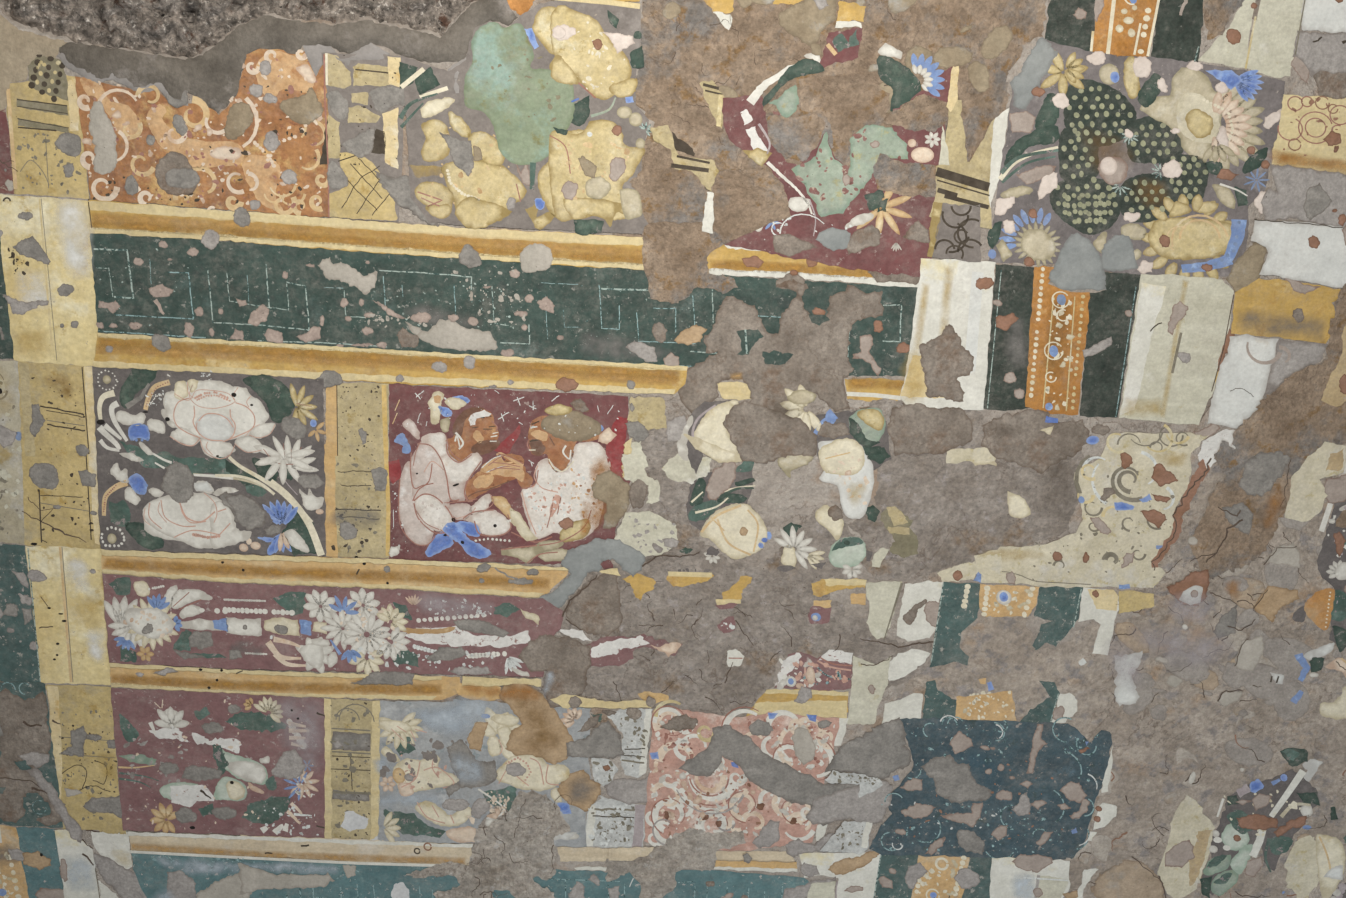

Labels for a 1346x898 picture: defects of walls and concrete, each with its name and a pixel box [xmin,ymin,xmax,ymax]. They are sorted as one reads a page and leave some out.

spalling [316,370,343,388]
flaking render [391,0,1346,898]
peeling [383,546,400,584]
spalling [135,631,214,677]
spalling [352,671,415,686]
flaking render [0,688,122,843]
spalling [271,749,305,780]
spalling [159,762,237,829]
spalling [341,811,378,840]
spalling [8,848,51,870]
spalling [35,888,64,898]
spalling [93,854,356,898]